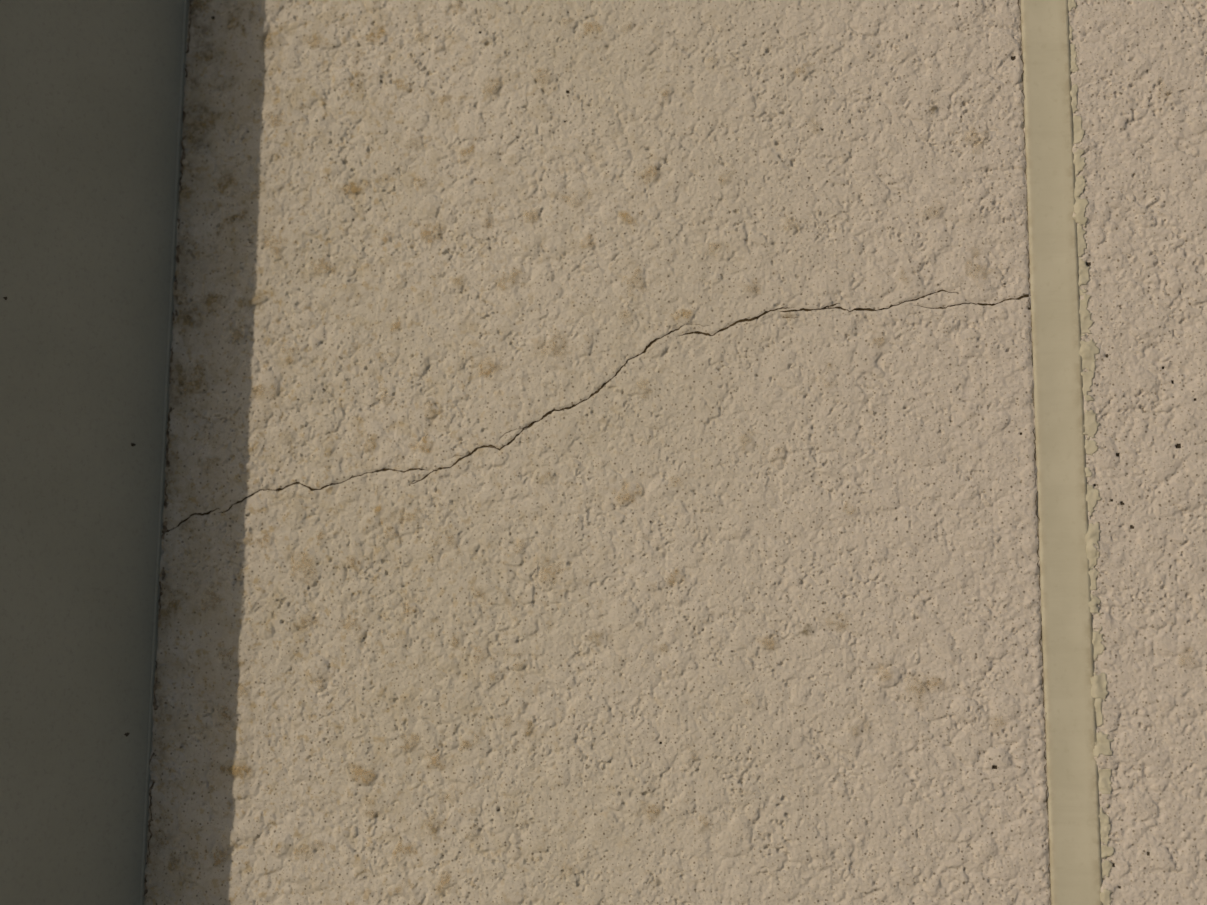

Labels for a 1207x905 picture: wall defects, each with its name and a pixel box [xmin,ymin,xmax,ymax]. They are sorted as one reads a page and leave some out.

crack [162,290,1031,533]